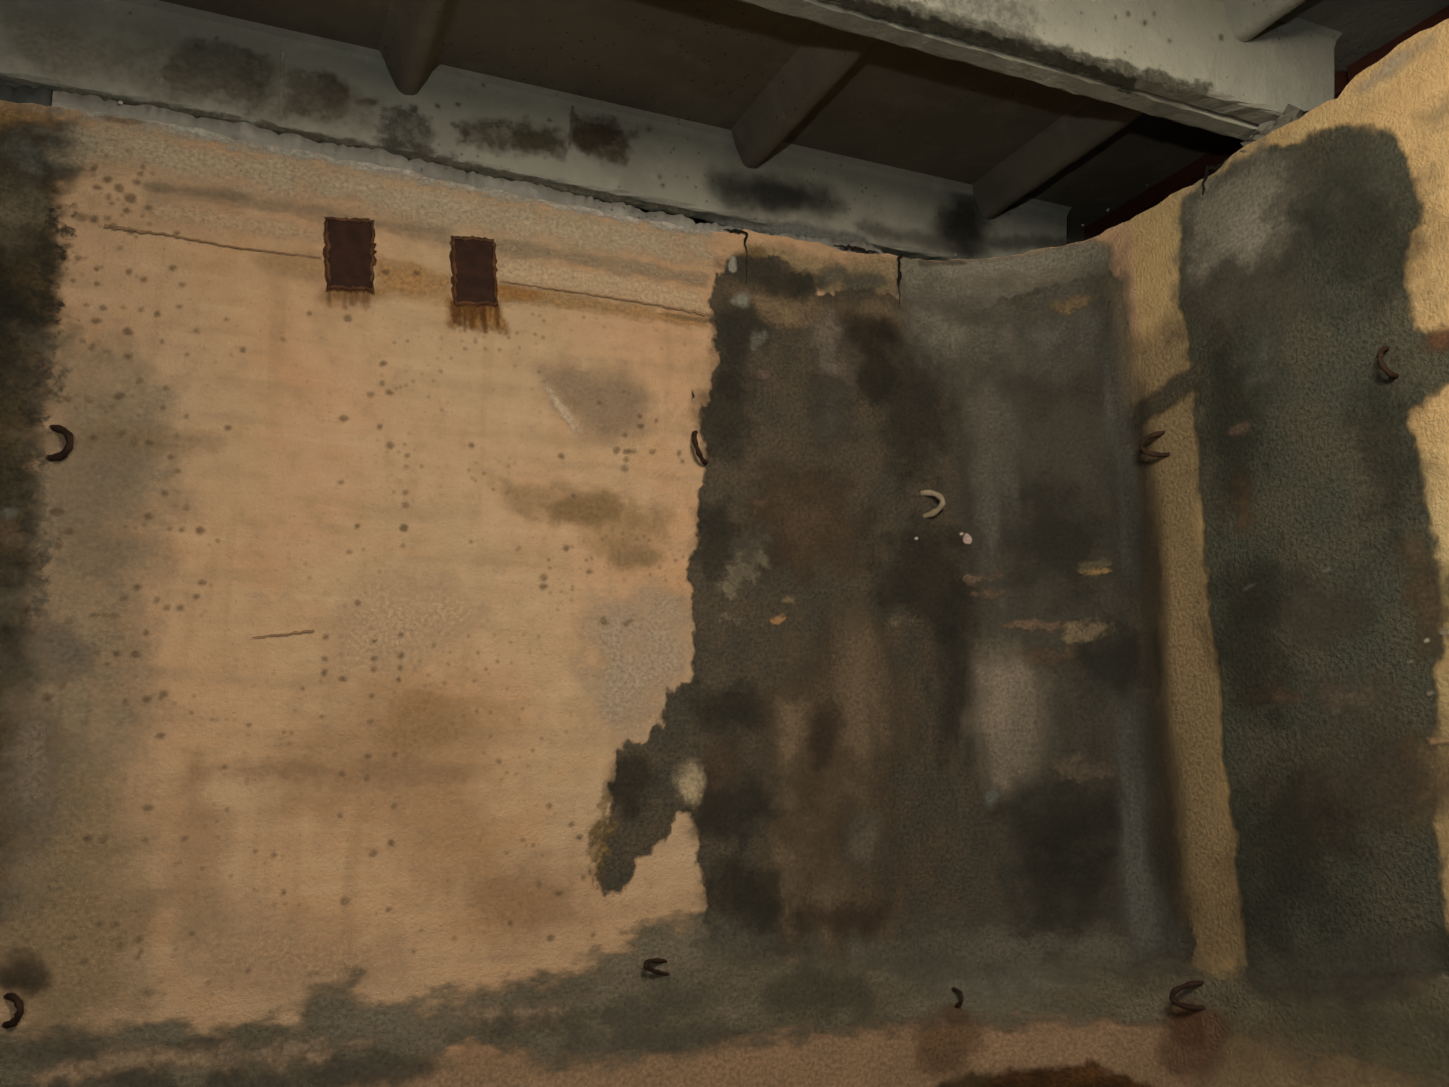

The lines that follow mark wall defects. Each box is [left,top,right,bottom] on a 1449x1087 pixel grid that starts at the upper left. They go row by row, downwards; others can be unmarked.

damp [20,27,692,215]
mould [821,0,1213,94]
rust [378,262,709,333]
damp [716,221,865,252]
damp [0,106,712,923]
damp [0,240,1449,1087]